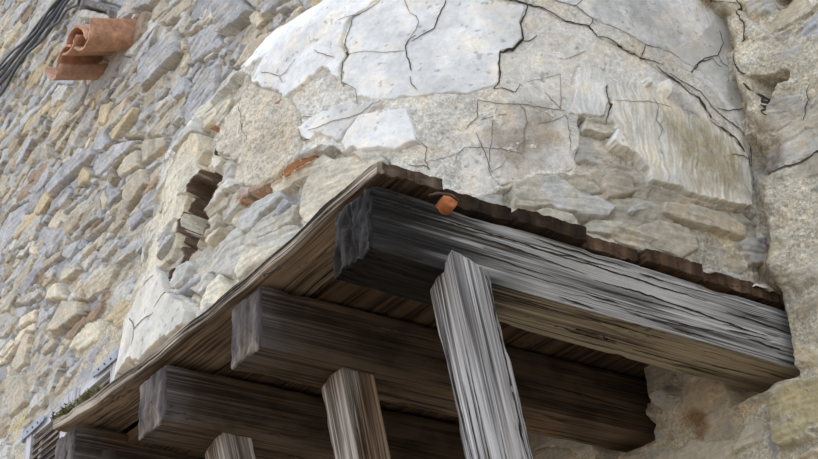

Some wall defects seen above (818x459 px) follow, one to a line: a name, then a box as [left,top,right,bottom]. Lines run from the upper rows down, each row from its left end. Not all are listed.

crack [298,0,446,141]
crack [410,0,818,185]
spalling [114,0,767,380]
crack [129,275,173,343]